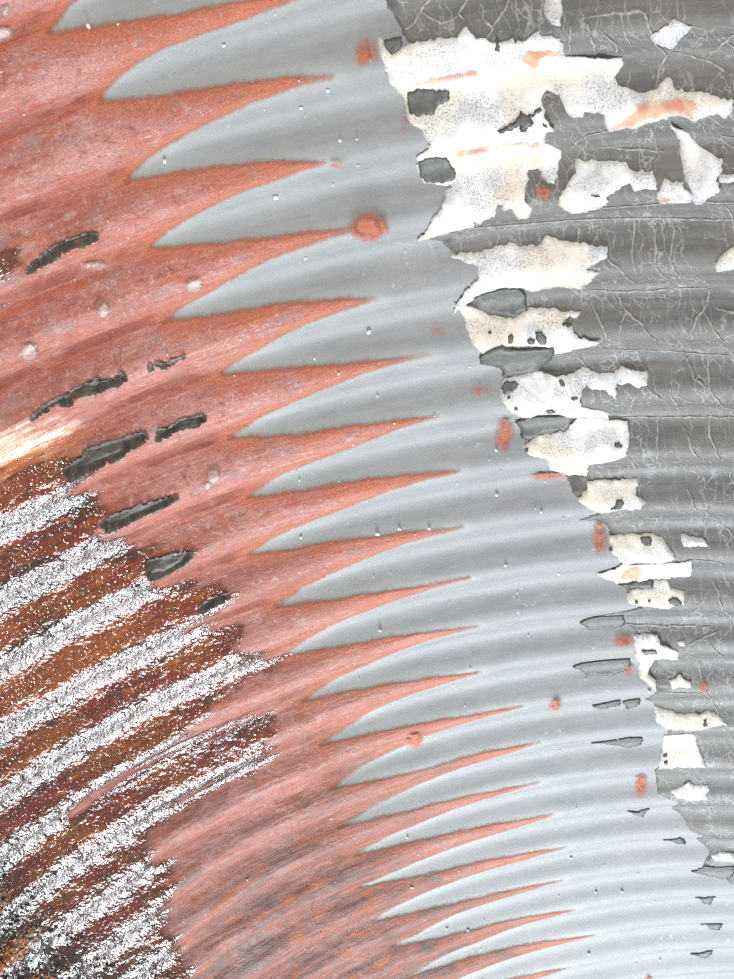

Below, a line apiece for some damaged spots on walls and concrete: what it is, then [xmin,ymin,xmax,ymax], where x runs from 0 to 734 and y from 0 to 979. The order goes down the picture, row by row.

crack [405,0,509,37]
crack [568,10,734,87]
peeling [377,0,734,242]
crack [572,127,665,152]
corrosion [0,0,459,598]
peeling [449,235,648,514]
corrosion [496,420,514,451]
peeling [596,533,693,609]
peeling [573,633,685,691]
corrosion [61,527,590,979]
corrosion [635,775,647,798]
peeling [654,705,728,769]